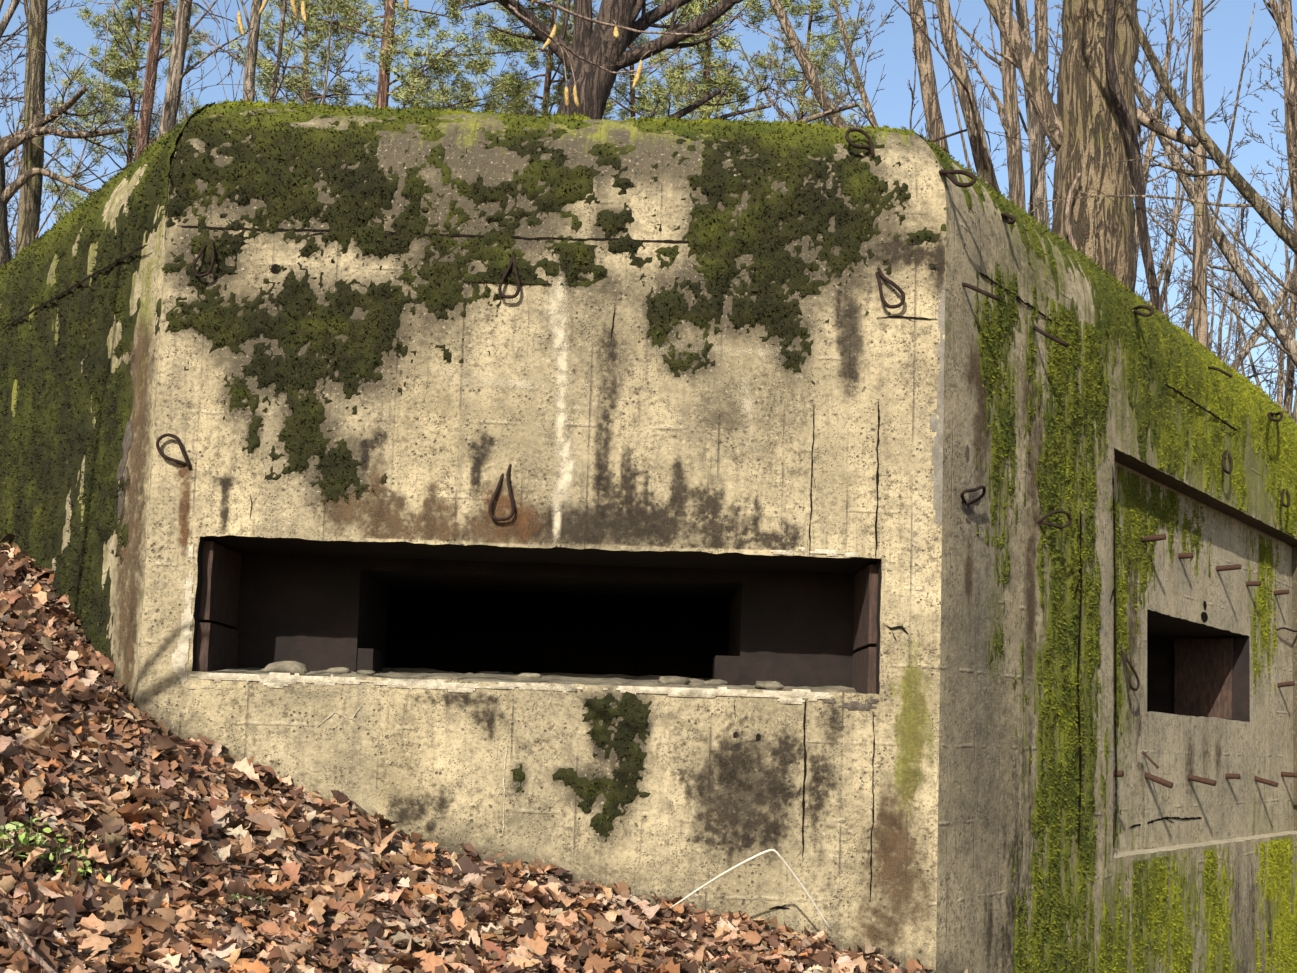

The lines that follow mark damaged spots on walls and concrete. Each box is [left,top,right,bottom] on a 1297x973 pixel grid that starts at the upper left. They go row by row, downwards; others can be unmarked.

leakage [836,290,858,380]
leakage [534,278,799,550]
rust [324,465,544,542]
leakage [680,707,842,862]